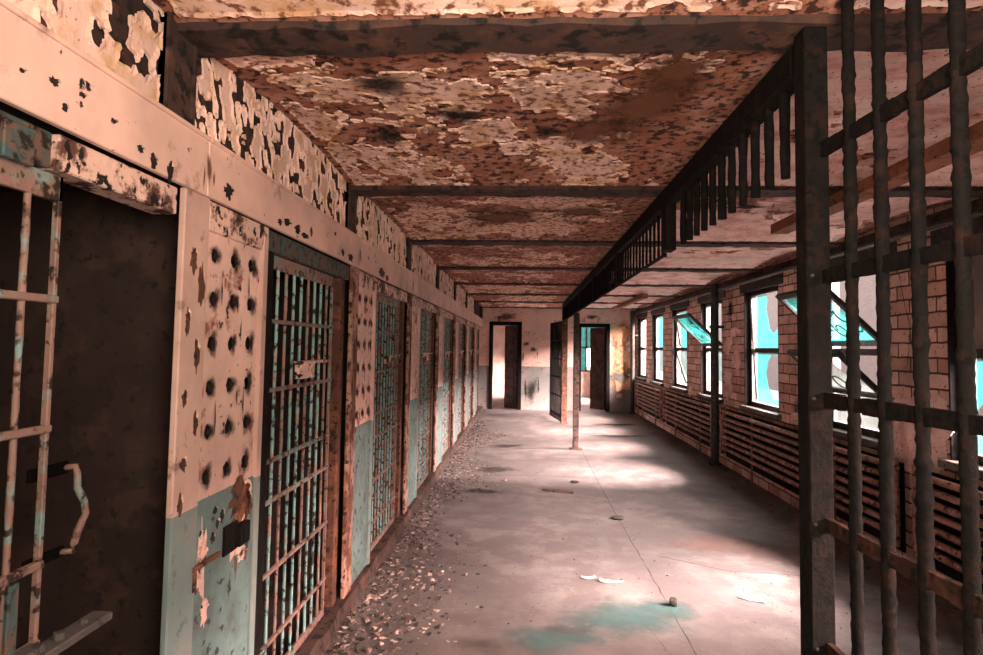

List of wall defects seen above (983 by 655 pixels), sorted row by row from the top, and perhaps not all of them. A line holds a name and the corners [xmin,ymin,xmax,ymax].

peeling [7,0,726,102]
peeling [768,0,802,11]
peeling [195,51,725,313]
peeling [195,475,253,628]
crack [528,448,800,655]